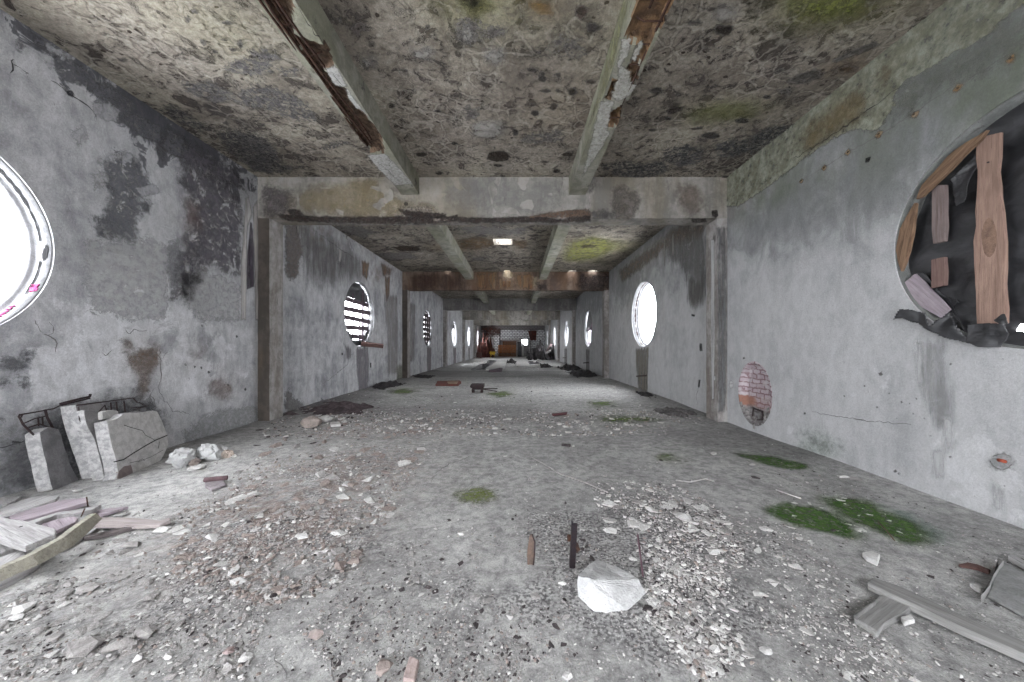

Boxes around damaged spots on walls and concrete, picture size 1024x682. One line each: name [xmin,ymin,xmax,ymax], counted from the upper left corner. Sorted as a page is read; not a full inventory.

spalling [182,0,412,185]
peeling [582,0,1024,223]
leakage [94,158,150,245]
leakage [156,134,291,320]
crack [35,321,58,352]
leakage [578,225,728,412]
flaking render [738,357,772,429]
crack [817,412,911,425]
spalling [990,453,1015,470]